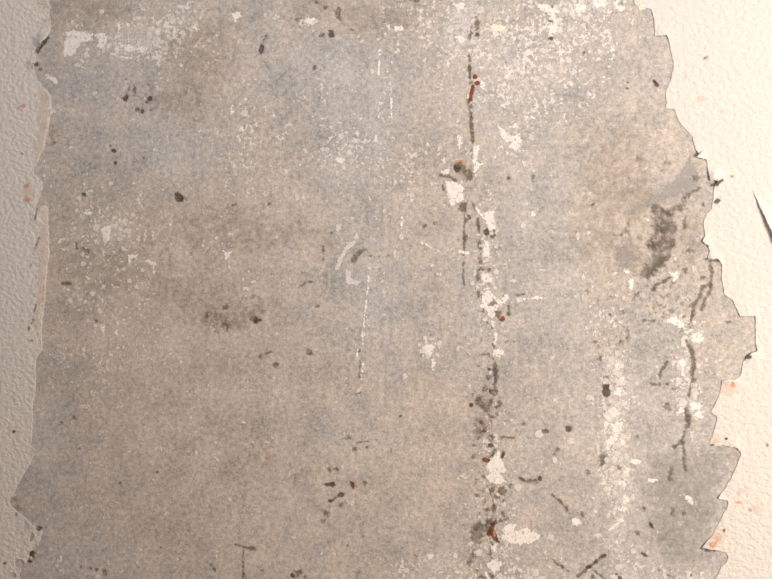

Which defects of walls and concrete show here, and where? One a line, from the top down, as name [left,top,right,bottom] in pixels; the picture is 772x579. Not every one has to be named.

peeling [753,191,772,231]
crack [690,265,714,321]
crack [440,65,544,579]
spalling [664,313,690,329]
spalling [681,332,705,347]
spalling [671,355,703,400]
crack [650,340,696,481]
spalling [676,398,706,422]
spalling [430,553,456,574]